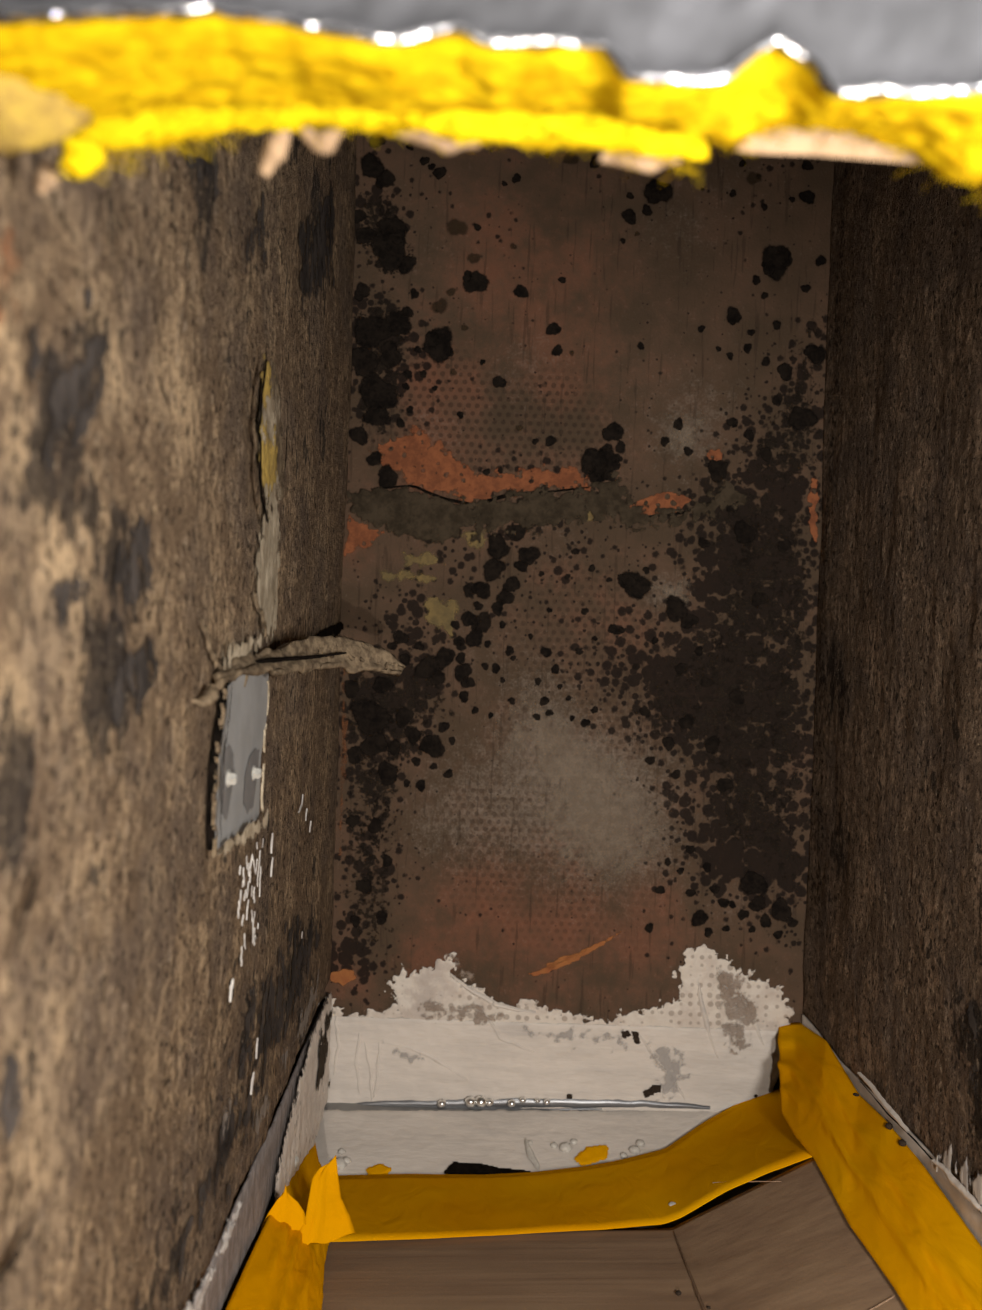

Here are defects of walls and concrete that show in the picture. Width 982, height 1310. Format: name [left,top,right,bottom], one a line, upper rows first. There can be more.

water stain [299,183,335,315]
mould [348,134,490,489]
mould [545,152,604,168]
mould [620,166,673,244]
mould [27,323,108,471]
crack [257,346,288,523]
mould [52,569,89,628]
water stain [497,202,848,939]
water stain [92,635,159,726]
peeling [192,684,219,707]
water stain [337,525,544,950]
water stain [0,1051,23,1151]